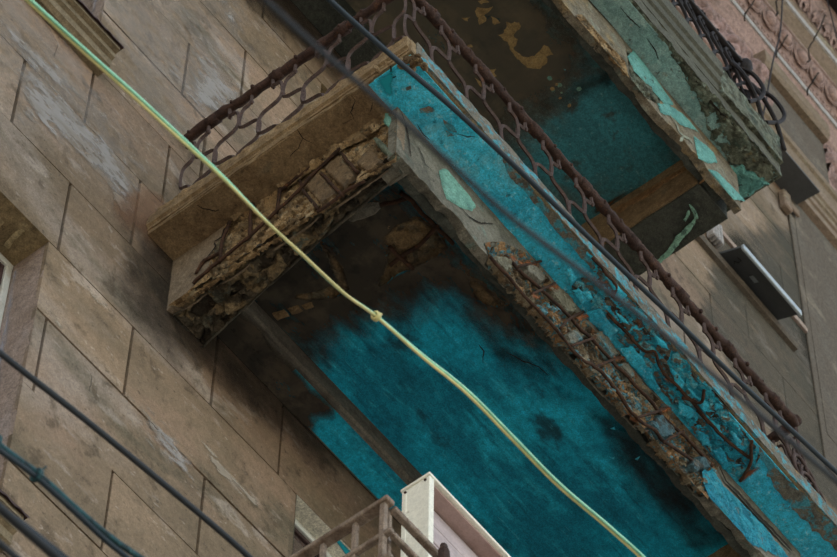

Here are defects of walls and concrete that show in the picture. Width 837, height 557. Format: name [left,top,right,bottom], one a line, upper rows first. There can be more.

spalling [168,113,455,333]
peeling [439,169,476,211]
peeling [462,0,553,69]
spalling [575,14,779,201]
spalling [484,159,837,557]